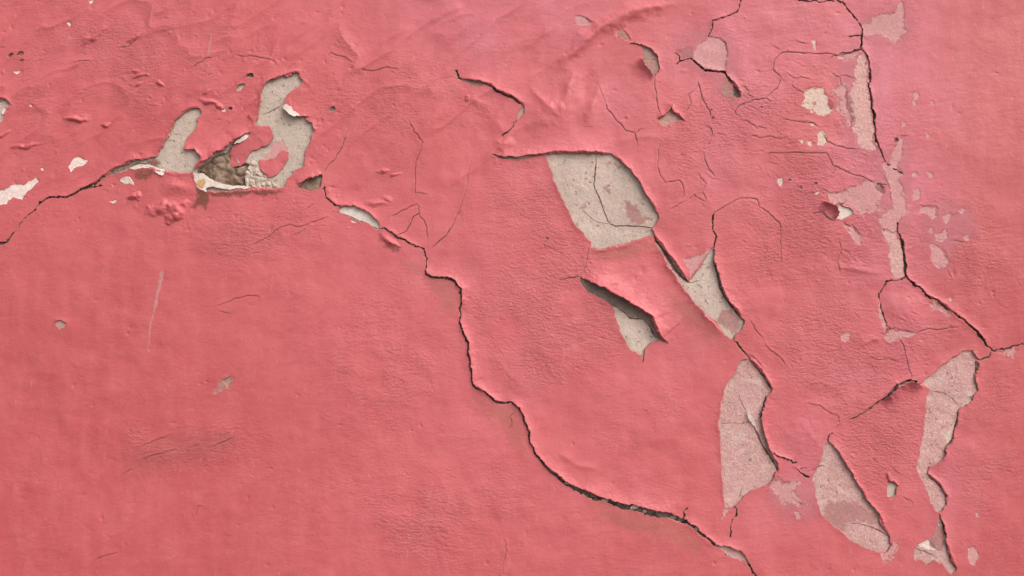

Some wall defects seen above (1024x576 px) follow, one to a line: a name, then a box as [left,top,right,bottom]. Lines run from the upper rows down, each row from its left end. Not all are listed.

crack [0,175,106,245]
peeling [100,72,326,192]
crack [255,131,347,244]
crack [454,69,524,137]
peeling [492,152,745,343]
crack [606,0,1024,442]
crack [381,123,738,548]
peeling [580,277,667,362]
peeling [718,357,779,509]
crack [773,453,816,505]
peeling [812,438,892,552]
peeling [913,350,980,575]